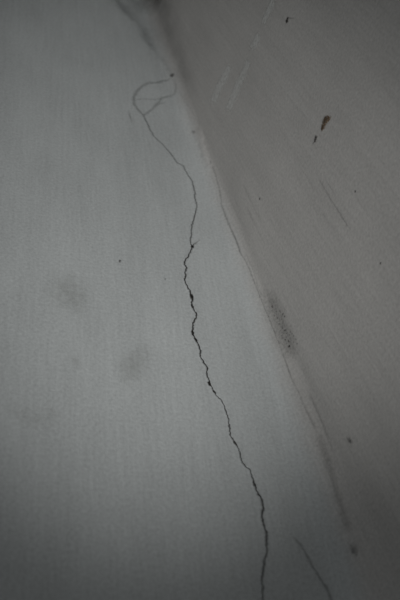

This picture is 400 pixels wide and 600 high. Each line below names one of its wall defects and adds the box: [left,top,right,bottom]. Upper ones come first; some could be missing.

crack [182,178,268,569]